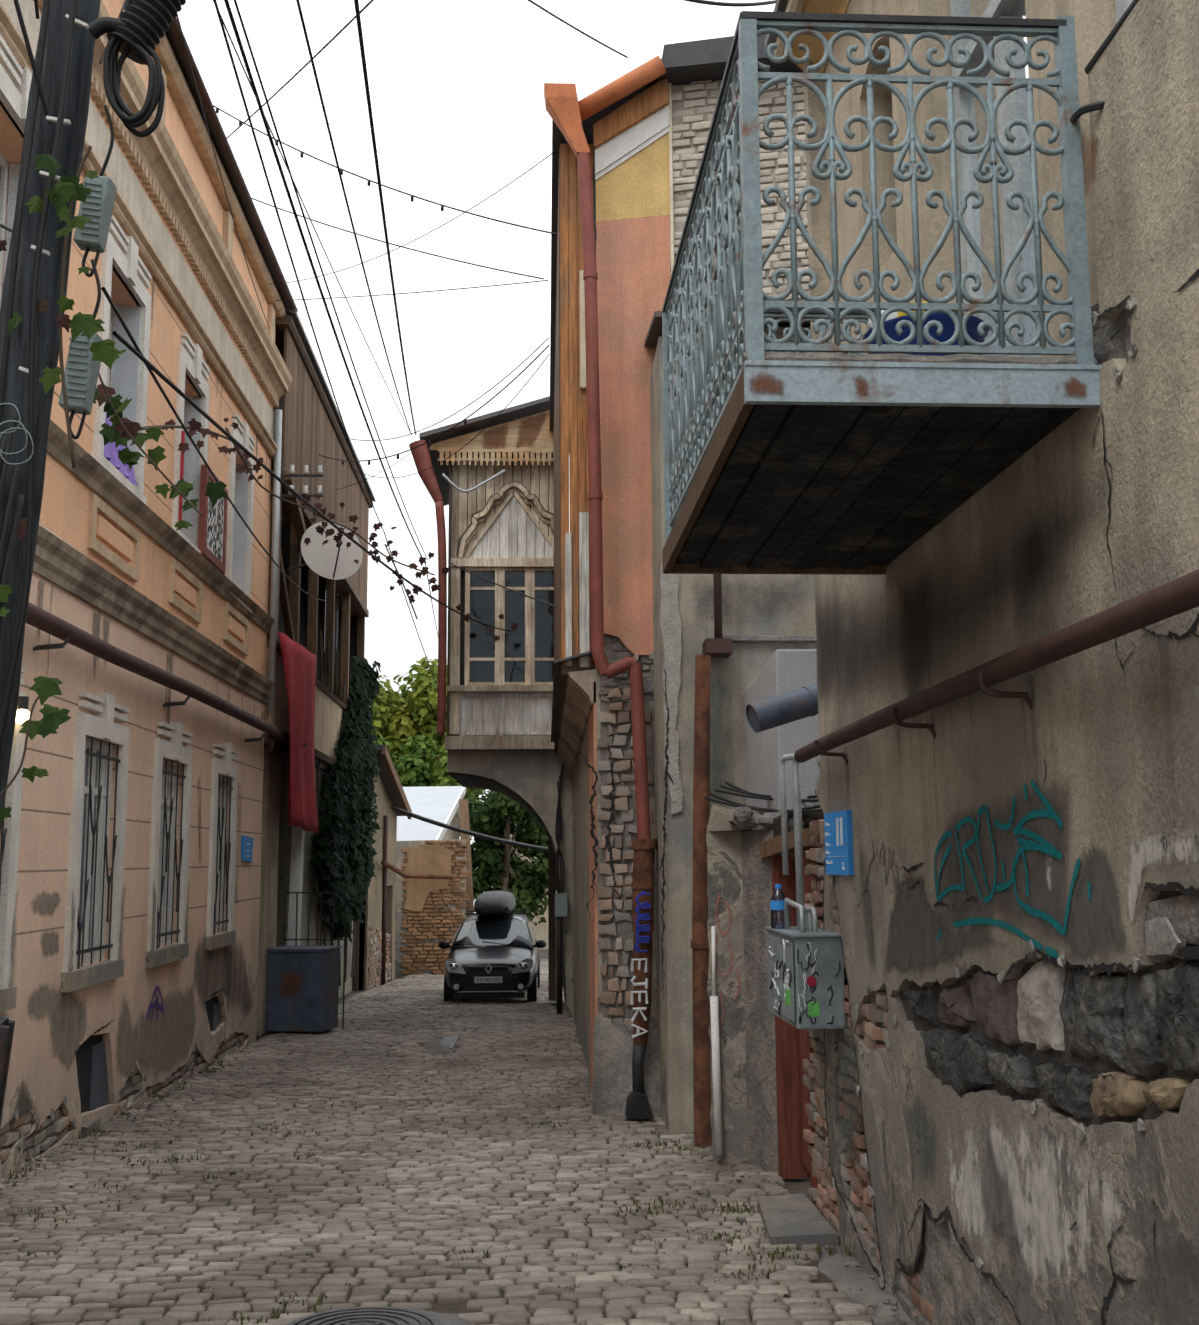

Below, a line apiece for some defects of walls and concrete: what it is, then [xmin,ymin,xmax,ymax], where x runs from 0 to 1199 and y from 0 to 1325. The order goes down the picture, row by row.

crack [1174,269,1199,293]
flaking render [1091,297,1138,382]
corrosion [751,375,783,394]
corrosion [856,377,867,395]
corrosion [1065,378,1086,397]
crack [1092,408,1116,590]
water stain [817,579,999,690]
crack [1115,614,1199,691]
water stain [118,894,251,1073]
flaking render [820,855,1199,1325]
water stain [904,1104,1121,1286]